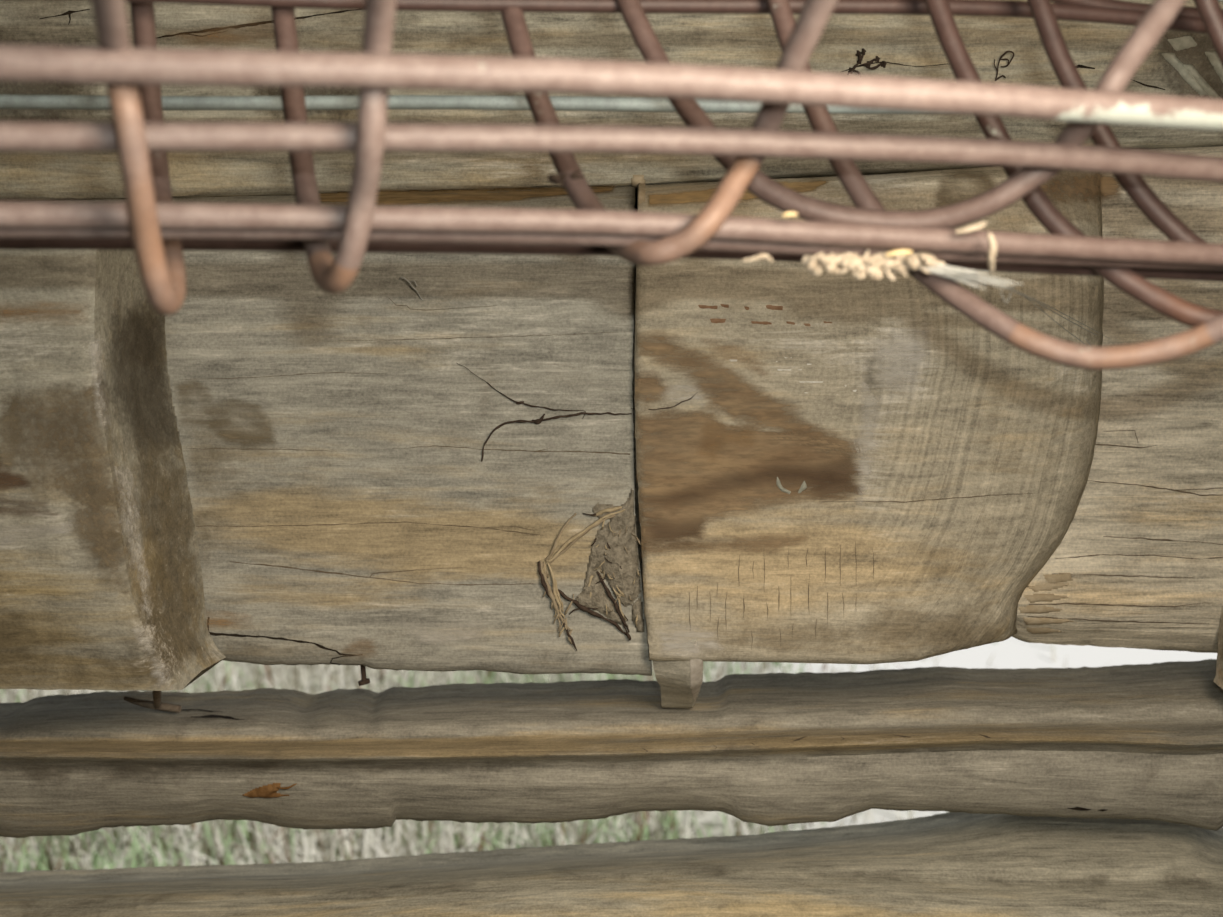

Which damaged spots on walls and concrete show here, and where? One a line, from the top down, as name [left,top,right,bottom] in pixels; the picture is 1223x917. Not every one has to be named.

water stain [0,344,148,609]
crack [392,445,630,455]
water stain [635,336,875,552]
crack [207,617,362,665]